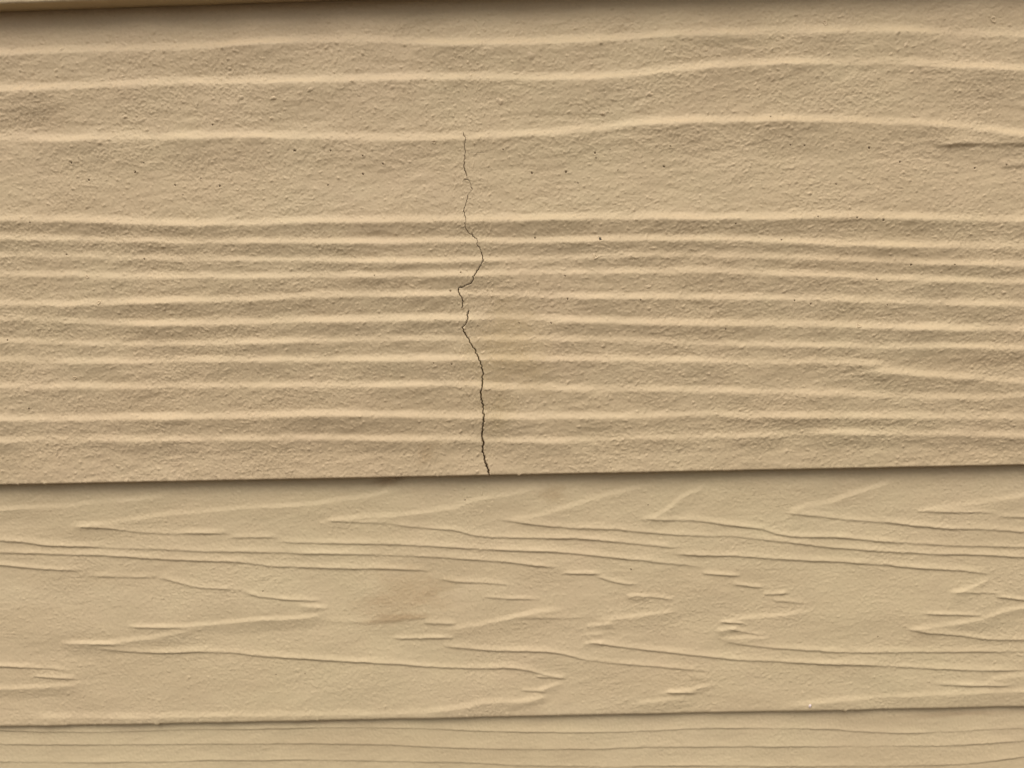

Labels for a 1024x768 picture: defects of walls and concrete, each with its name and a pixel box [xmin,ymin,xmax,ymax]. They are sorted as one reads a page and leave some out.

crack [458,132,490,475]